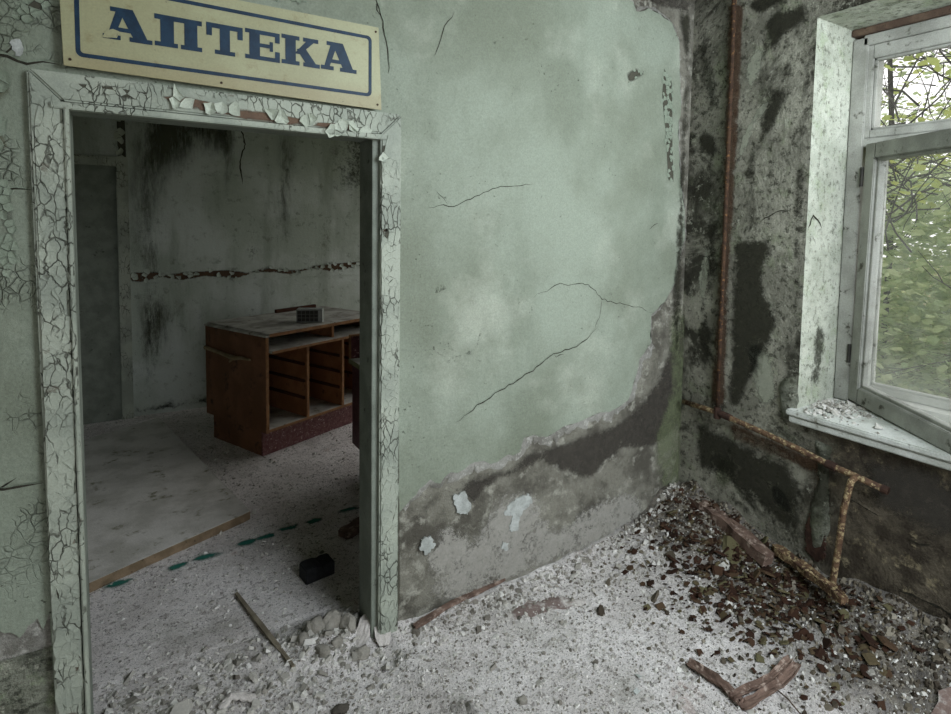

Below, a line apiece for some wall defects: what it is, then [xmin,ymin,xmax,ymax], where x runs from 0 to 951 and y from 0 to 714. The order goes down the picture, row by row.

crack [376,0,390,73]
damp [143,123,228,210]
peeling [70,81,372,138]
crack [431,184,531,208]
rust [711,5,743,405]
peeling [0,102,84,714]
spalling [379,0,695,635]
crack [457,283,652,422]
damp [698,425,800,539]
damp [730,241,776,406]
rust [731,422,818,471]
damp [812,327,824,382]